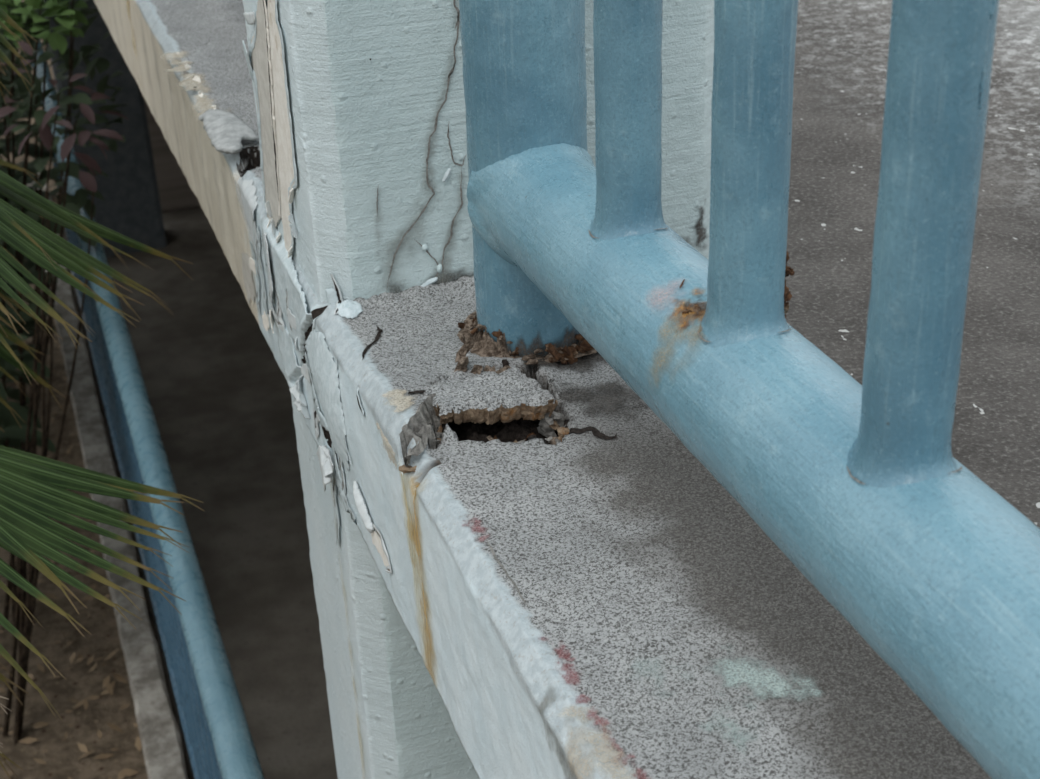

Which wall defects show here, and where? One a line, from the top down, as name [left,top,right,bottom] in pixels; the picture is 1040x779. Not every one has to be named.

peeling [198,0,313,352]
crack [387,0,467,287]
corrosion [454,311,607,379]
corrosion [654,289,707,370]
spalling [376,359,570,473]
peeling [289,381,392,574]
corrosion [403,484,421,562]